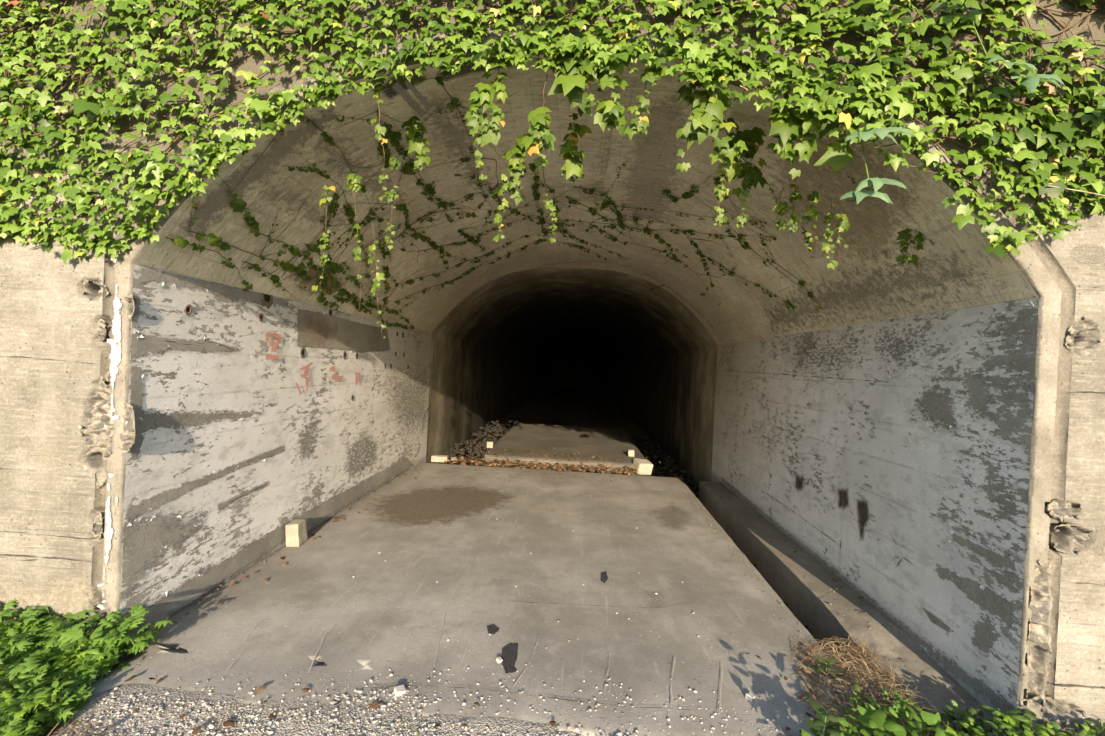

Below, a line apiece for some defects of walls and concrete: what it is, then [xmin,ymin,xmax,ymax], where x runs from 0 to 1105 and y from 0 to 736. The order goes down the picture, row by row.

peeling [783,301,1037,433]
spalling [1065,316,1103,358]
peeling [77,258,435,637]
damp [373,487,512,526]
spalling [721,477,1095,728]